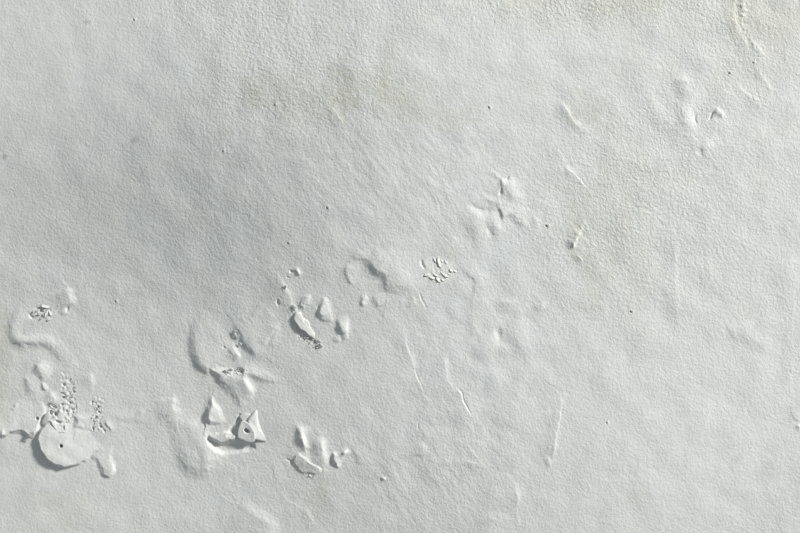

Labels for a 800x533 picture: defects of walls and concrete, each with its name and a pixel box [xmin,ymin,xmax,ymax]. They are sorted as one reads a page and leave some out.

spalling [28,305,52,321]
flaking render [269,266,324,351]
flaking render [41,377,116,435]
peeling [198,410,266,473]